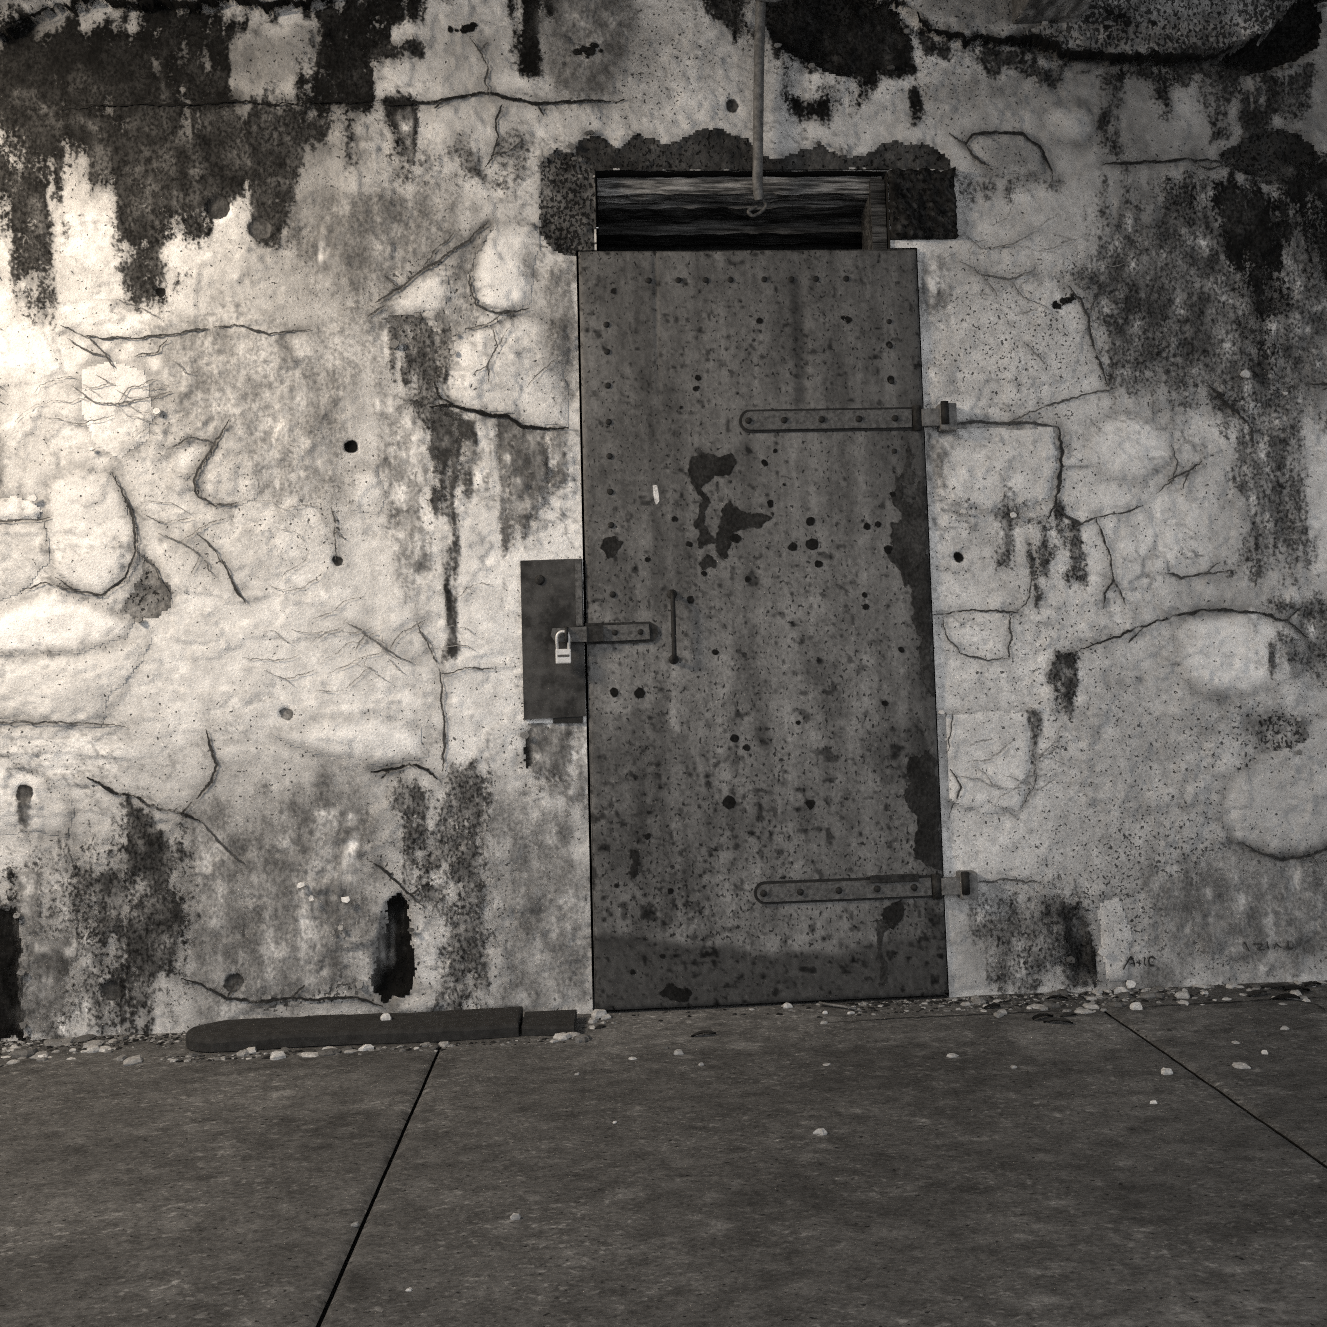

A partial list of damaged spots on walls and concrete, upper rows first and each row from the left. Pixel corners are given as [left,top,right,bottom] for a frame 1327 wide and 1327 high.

spalling [1009,0,1327,76]
leakage [0,0,569,661]
crack [367,221,568,430]
leakage [523,259,579,396]
leakage [702,0,1327,688]
crack [941,202,1309,649]
crack [0,299,493,779]
spalling [0,908,143,1066]
crack [86,730,245,865]
spalling [223,973,244,992]
spalling [247,893,417,1021]
leakage [386,758,591,1015]